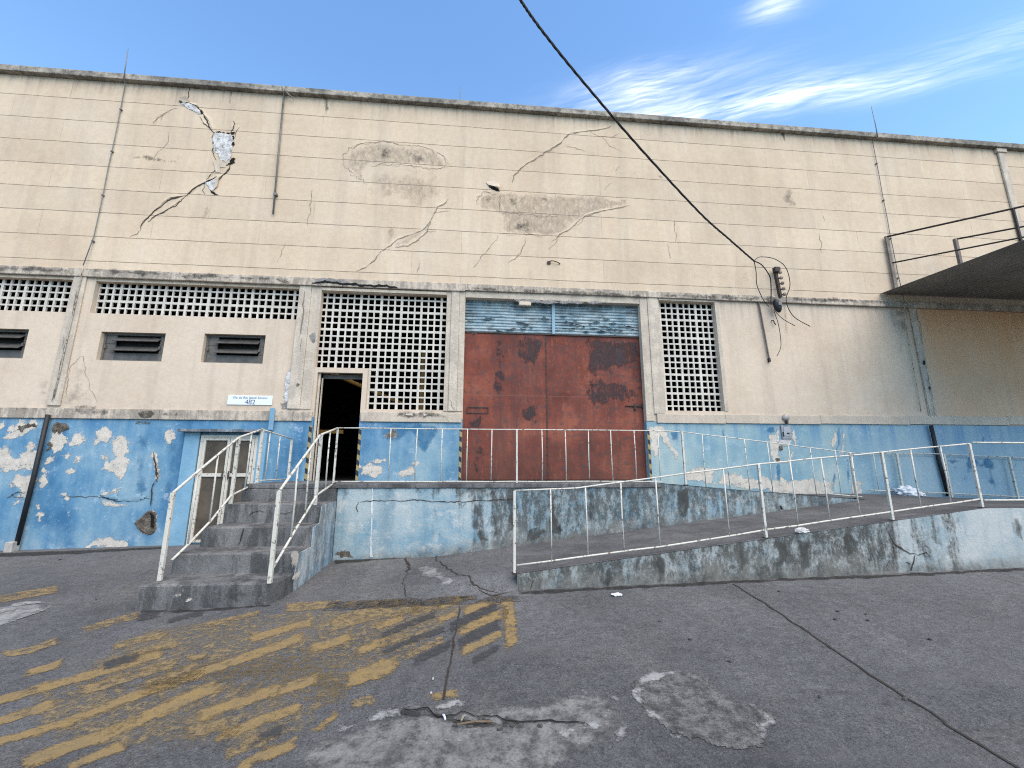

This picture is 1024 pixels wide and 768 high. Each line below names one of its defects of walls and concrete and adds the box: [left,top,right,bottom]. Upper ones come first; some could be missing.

crack [129,88,239,238]
crack [473,124,630,268]
peeling [648,426,679,459]
peeling [0,419,130,507]
spalling [135,452,160,535]
crack [356,499,511,511]
leakage [527,497,562,540]
leakage [678,488,689,516]
peeling [687,466,837,494]
peeling [85,537,128,548]
leakage [775,541,809,567]
crack [403,707,590,726]